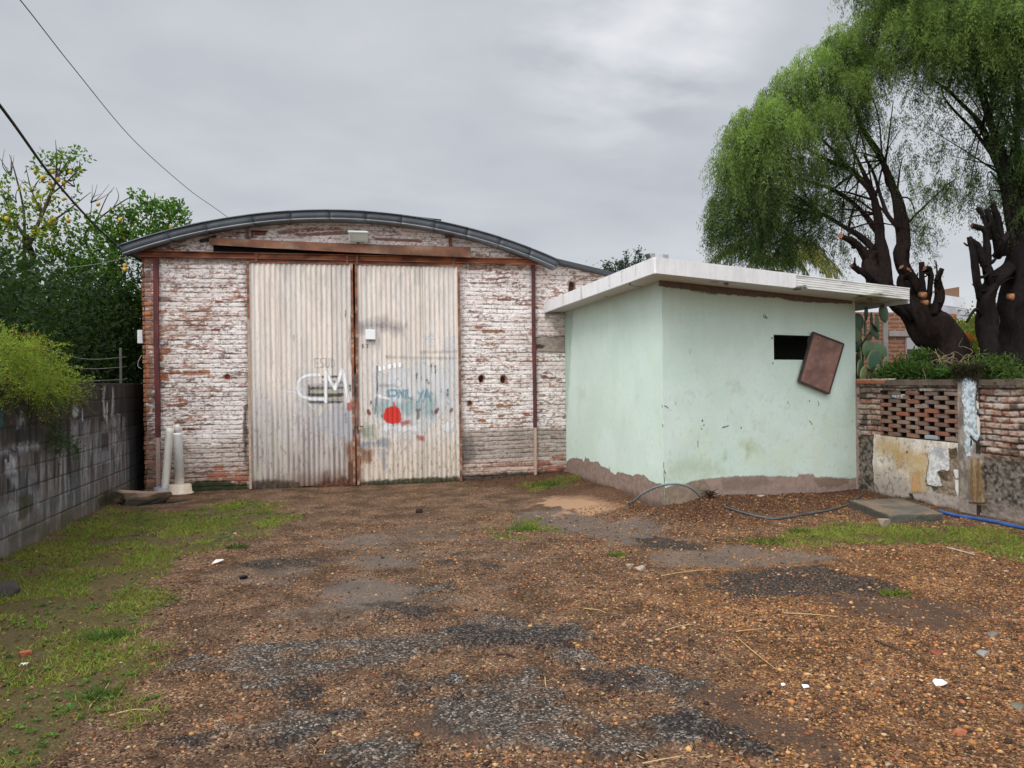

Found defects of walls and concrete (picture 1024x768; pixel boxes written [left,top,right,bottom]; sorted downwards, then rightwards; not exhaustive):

peeling [144,302,166,328]
peeling [145,342,210,412]
leakage [4,444,34,483]
leakage [84,387,119,469]
corrosion [316,443,371,487]
flaking render [482,454,709,508]
peeling [926,376,982,497]